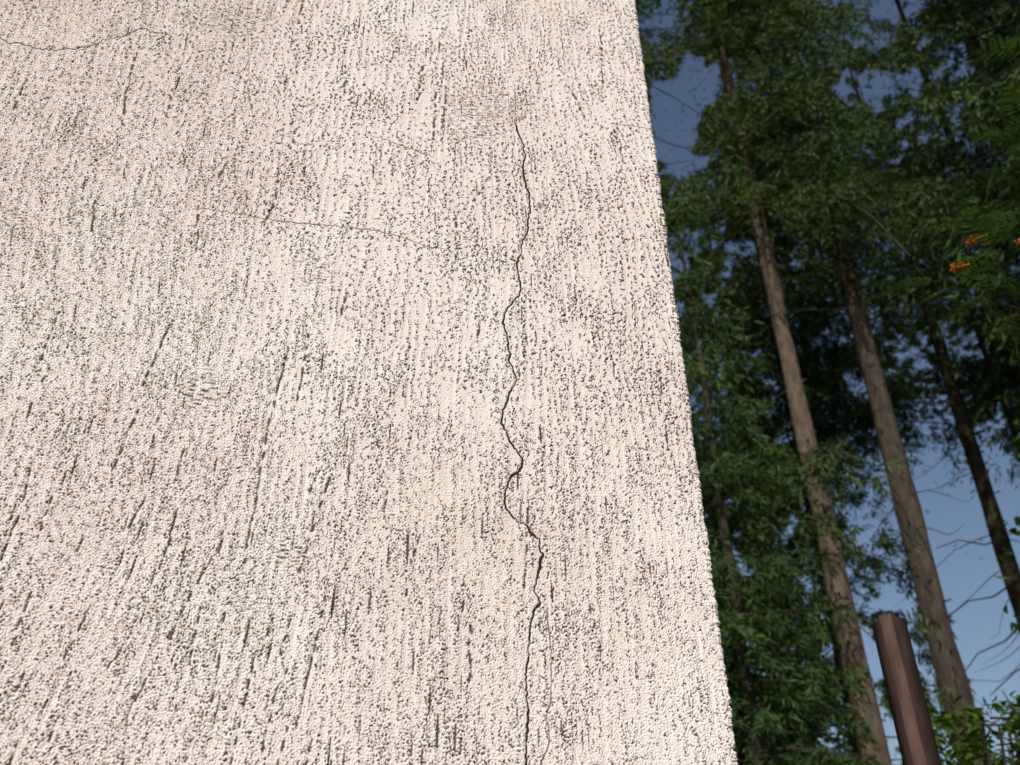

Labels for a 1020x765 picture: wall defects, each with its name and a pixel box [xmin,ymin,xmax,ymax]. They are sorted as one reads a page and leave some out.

crack [500,92,552,765]